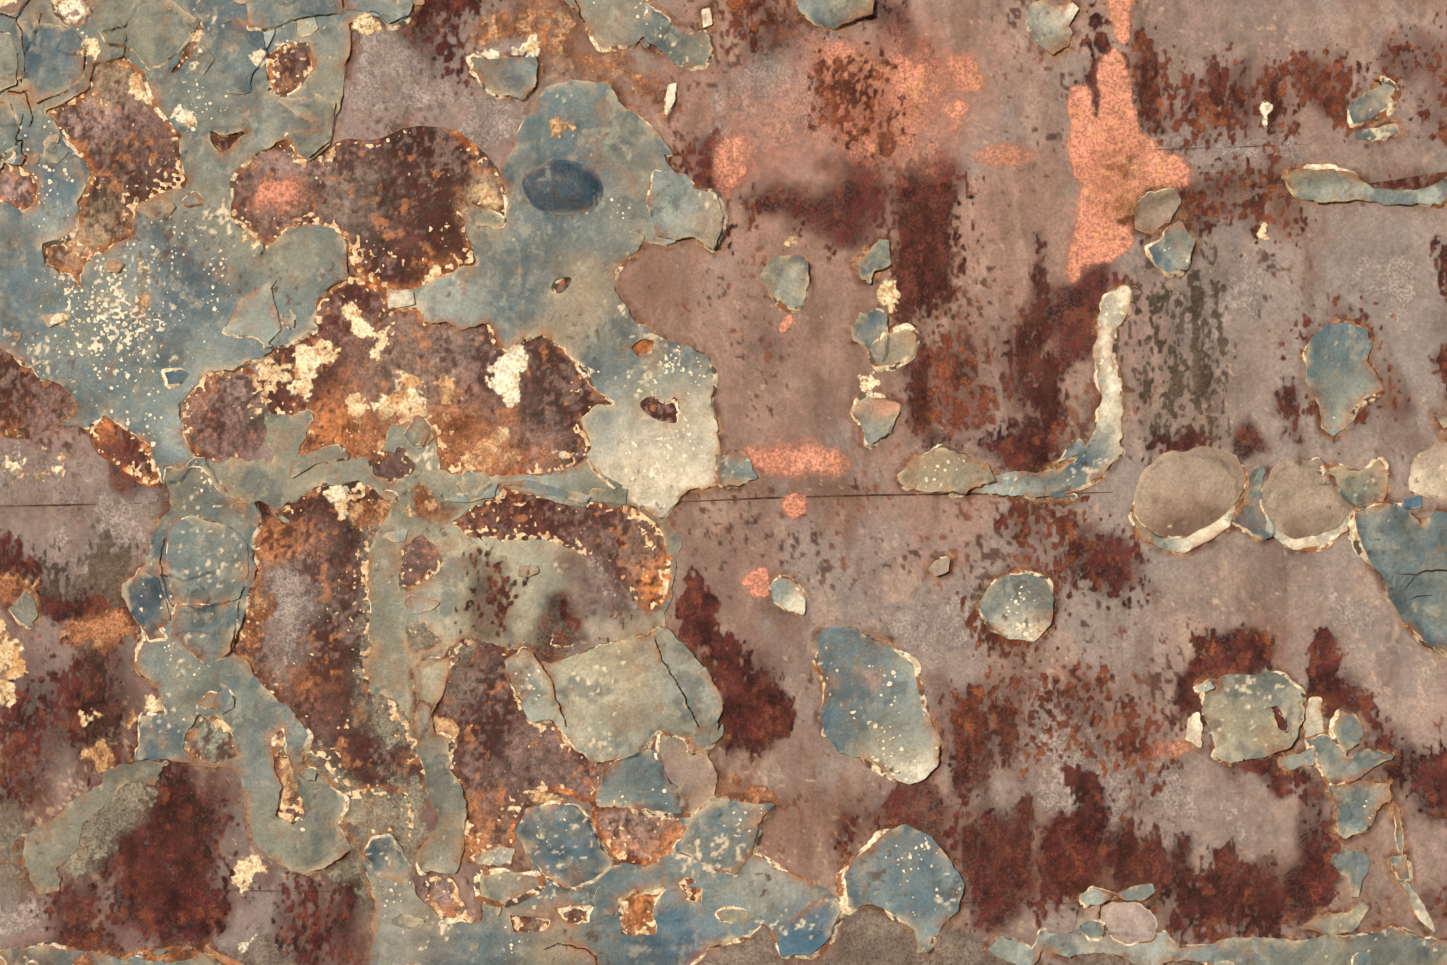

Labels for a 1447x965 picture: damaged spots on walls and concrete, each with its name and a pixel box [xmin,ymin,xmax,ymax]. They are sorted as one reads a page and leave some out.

rust [668,0,1142,473]
rust [1074,1,1447,256]
peeling [1281,163,1447,209]
rust [0,529,260,965]
rust [271,871,364,965]
peeling [0,0,965,965]
rust [674,566,796,763]
peeling [895,285,1133,502]
rust [834,488,1341,945]
peeling [984,668,1447,965]
peeling [1128,456,1447,658]
rust [1300,627,1447,820]